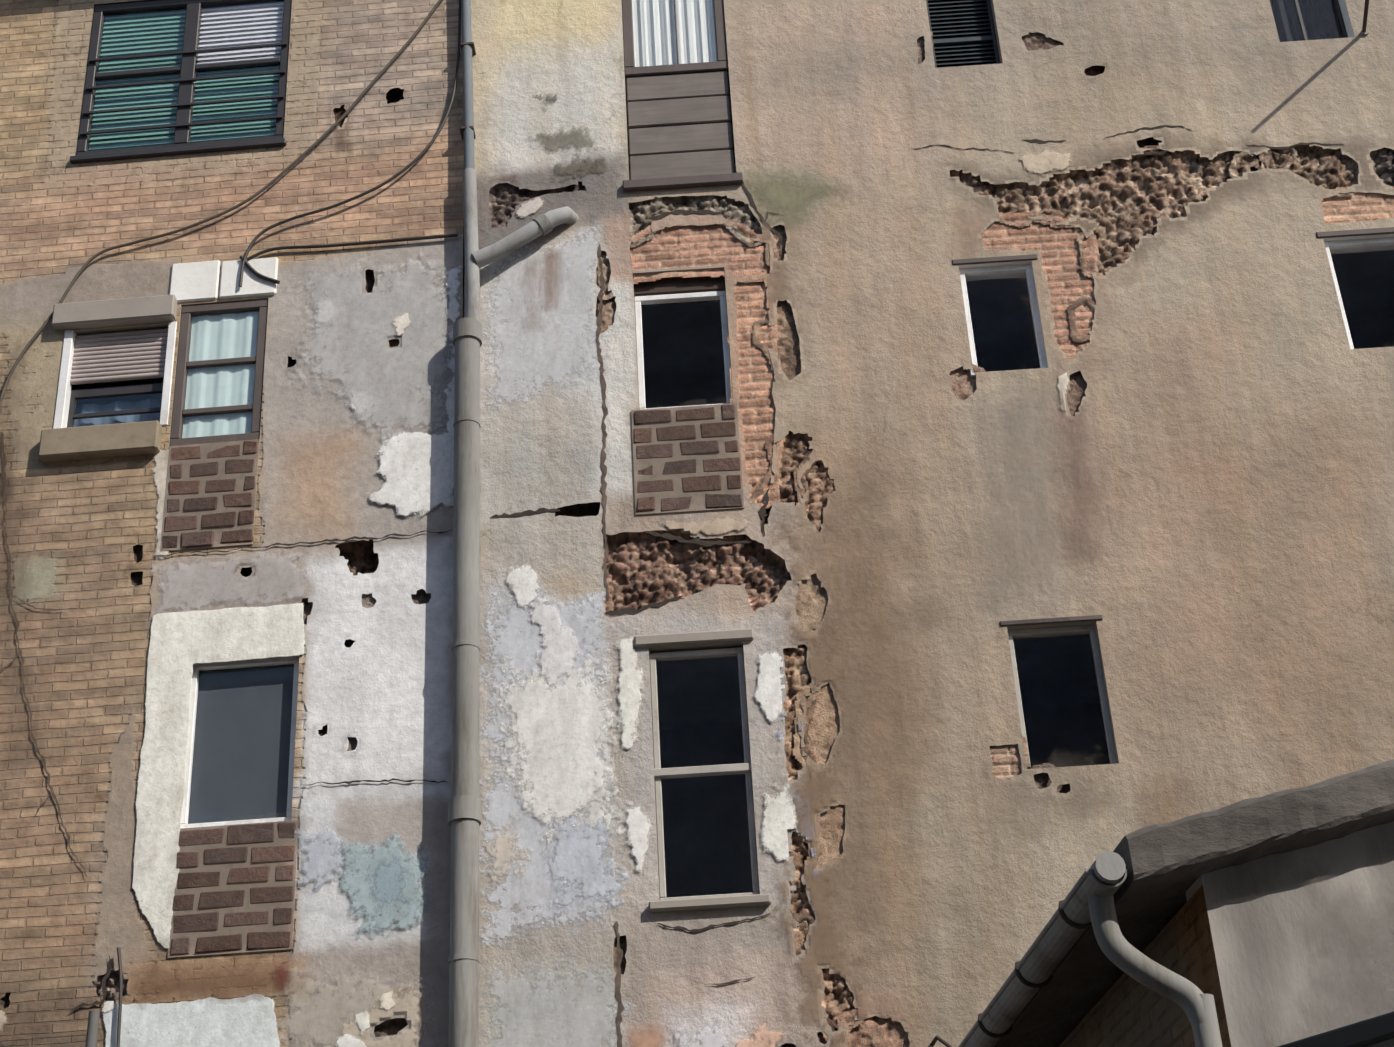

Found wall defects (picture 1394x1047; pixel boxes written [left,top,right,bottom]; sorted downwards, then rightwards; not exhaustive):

spalling [489,181,587,230]
spalling [950,145,1394,416]
peeling [291,255,462,516]
crack [595,243,616,602]
peeling [479,220,845,955]
crack [0,432,87,877]
peeling [294,830,434,937]
peeling [335,983,430,1047]
peeling [484,935,635,1047]
crack [614,921,625,1047]
peeling [674,1017,782,1047]
spalling [817,968,910,1047]